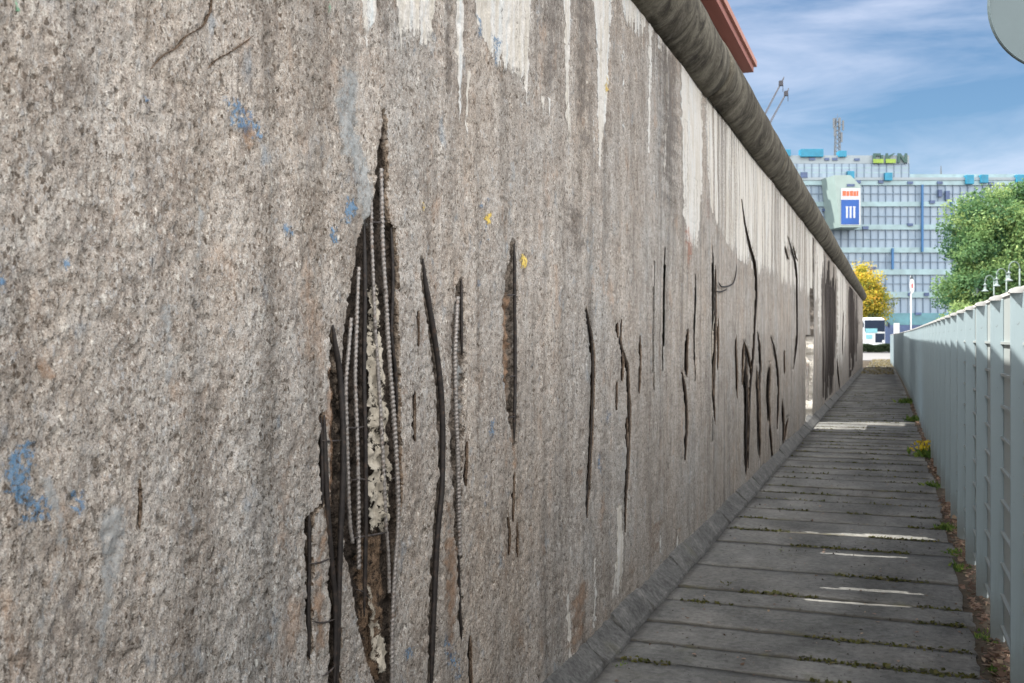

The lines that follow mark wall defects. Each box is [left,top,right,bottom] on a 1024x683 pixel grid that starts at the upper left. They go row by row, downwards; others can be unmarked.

spalling [320,108,404,683]
spalling [422,258,463,683]
crack [585,308,642,533]
crack [681,199,798,474]
crack [836,312,844,387]